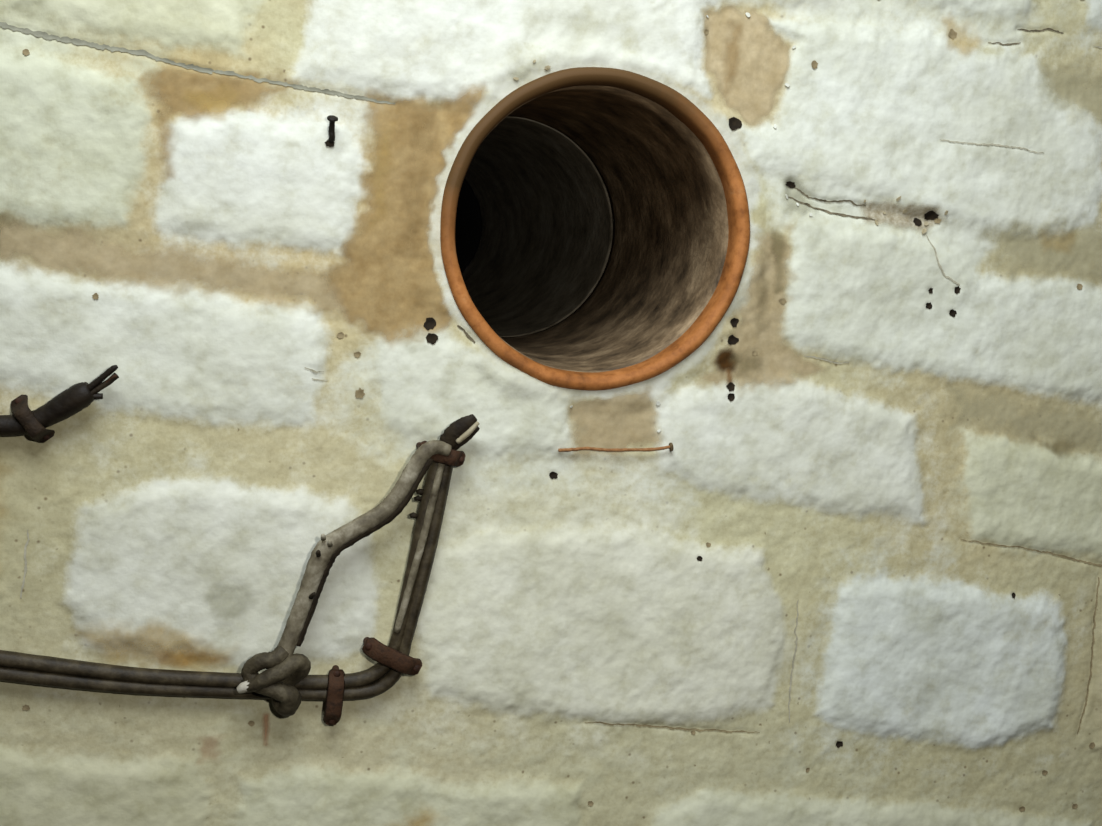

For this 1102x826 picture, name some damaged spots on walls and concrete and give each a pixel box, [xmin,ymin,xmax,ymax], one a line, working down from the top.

crack [789,188,878,221]
crack [927,236,960,285]
crack [961,539,1102,734]